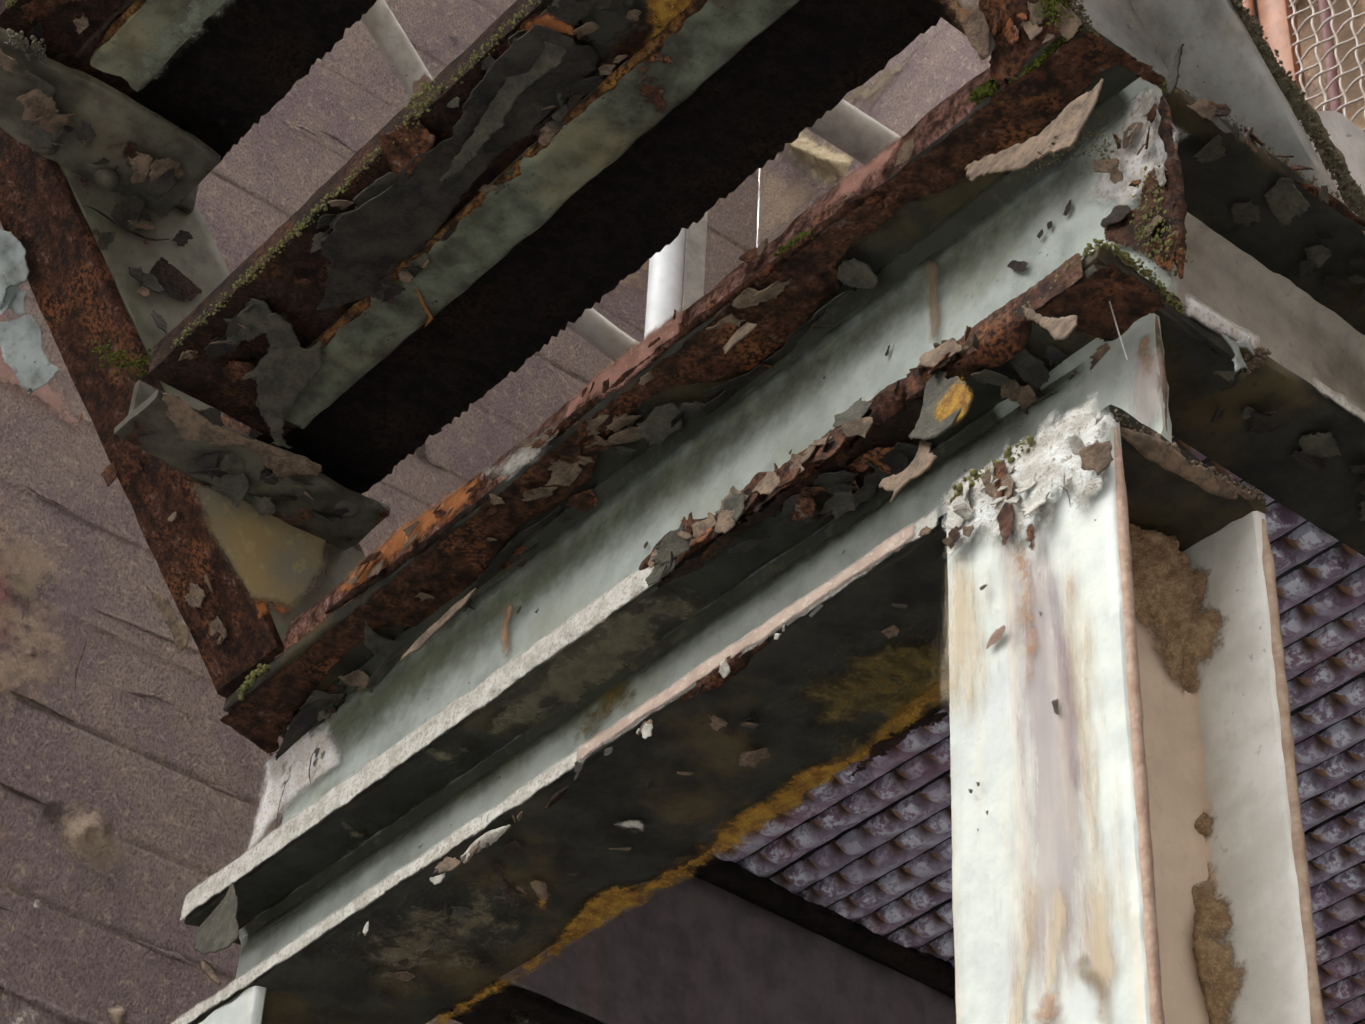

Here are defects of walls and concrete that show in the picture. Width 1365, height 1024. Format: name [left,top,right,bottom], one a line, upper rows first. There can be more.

peeling [292,0,627,311]
spalling [779,132,900,210]
peeling [964,79,1104,182]
corrosion [1103,165,1180,271]
corrosion [148,257,202,302]
peeling [565,310,683,423]
corrosion [220,0,1165,756]
peeling [162,298,326,606]
water stain [808,565,976,721]
water stain [578,683,635,734]
corrosion [1035,994,1057,1024]
corrosion [1077,957,1104,1016]